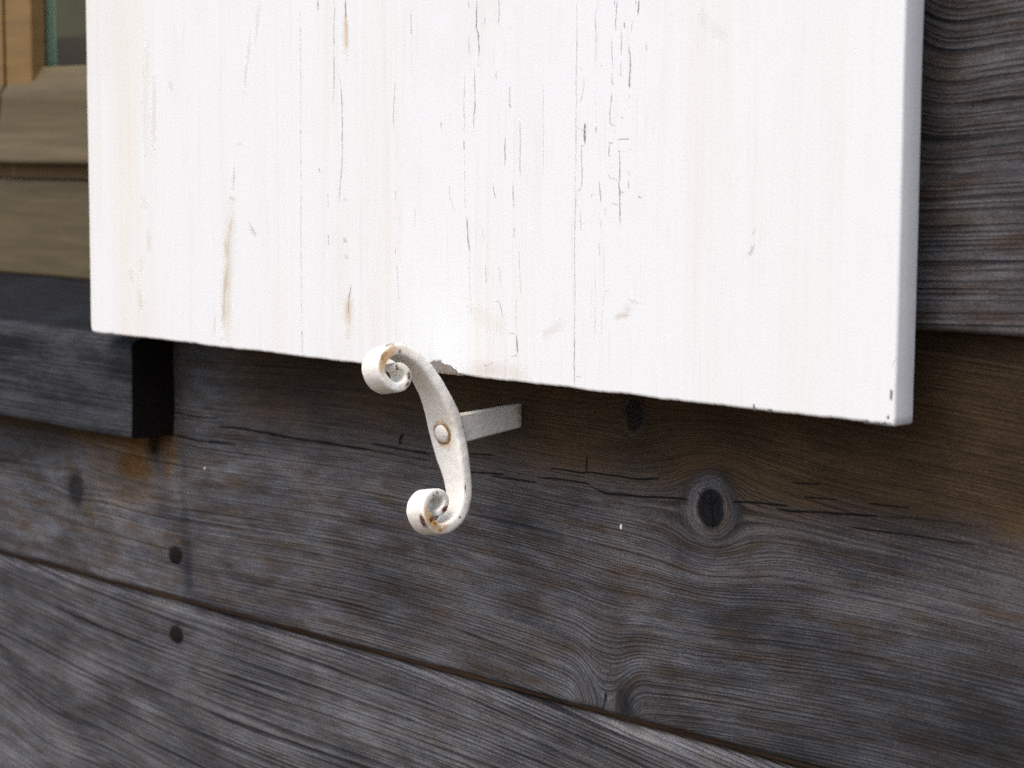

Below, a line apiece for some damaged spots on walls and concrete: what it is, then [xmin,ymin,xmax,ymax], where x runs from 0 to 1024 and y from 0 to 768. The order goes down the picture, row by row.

peeling [430,360,463,376]
crack [469,453,978,545]